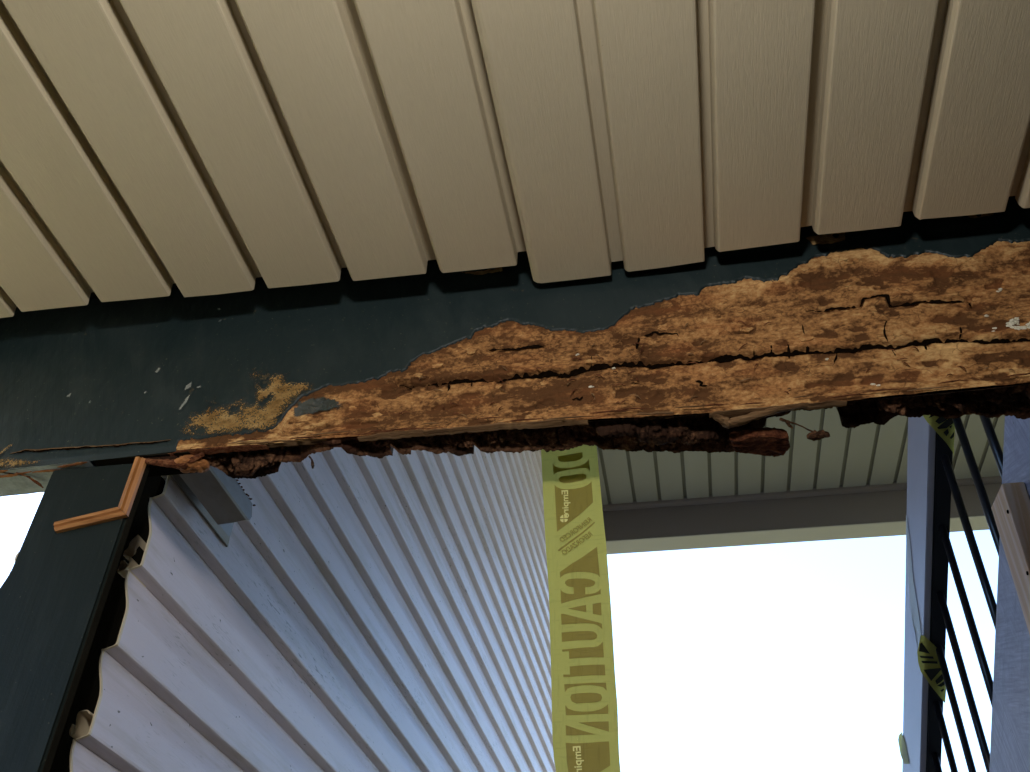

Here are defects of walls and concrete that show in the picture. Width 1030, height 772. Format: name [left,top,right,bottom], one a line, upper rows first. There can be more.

crack [399,294,1030,401]
peeling [182,369,314,438]